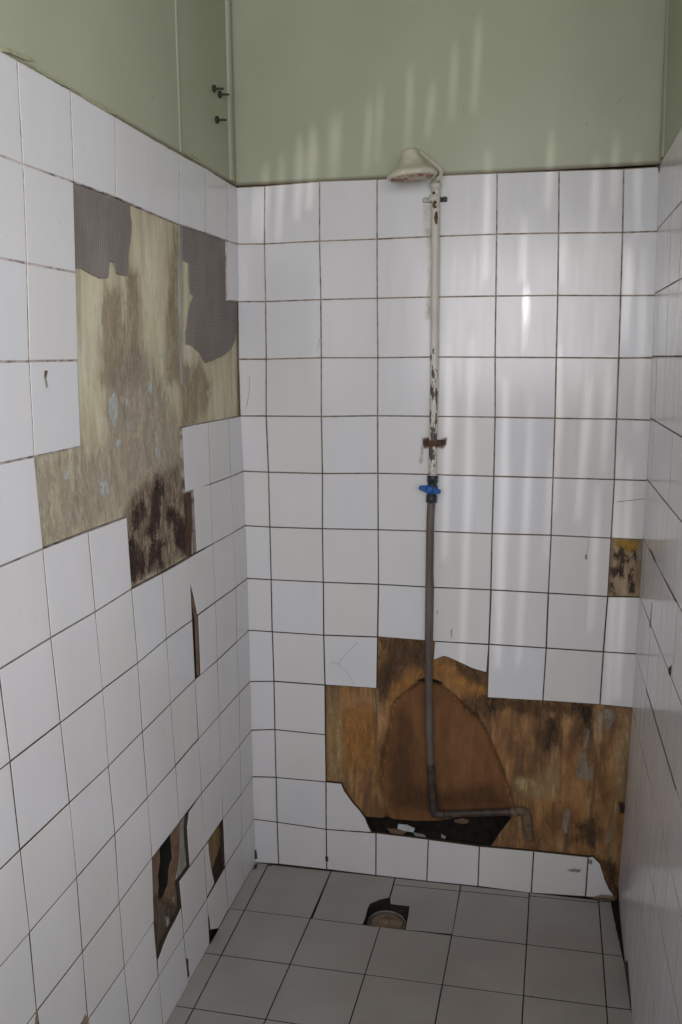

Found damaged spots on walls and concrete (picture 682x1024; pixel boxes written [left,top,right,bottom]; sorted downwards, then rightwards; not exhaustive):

peeling [34,183,240,587]
spalling [191,594,199,676]
peeling [608,538,643,596]
spalling [152,815,186,954]
spalling [208,824,222,880]
spalling [326,637,633,1010]